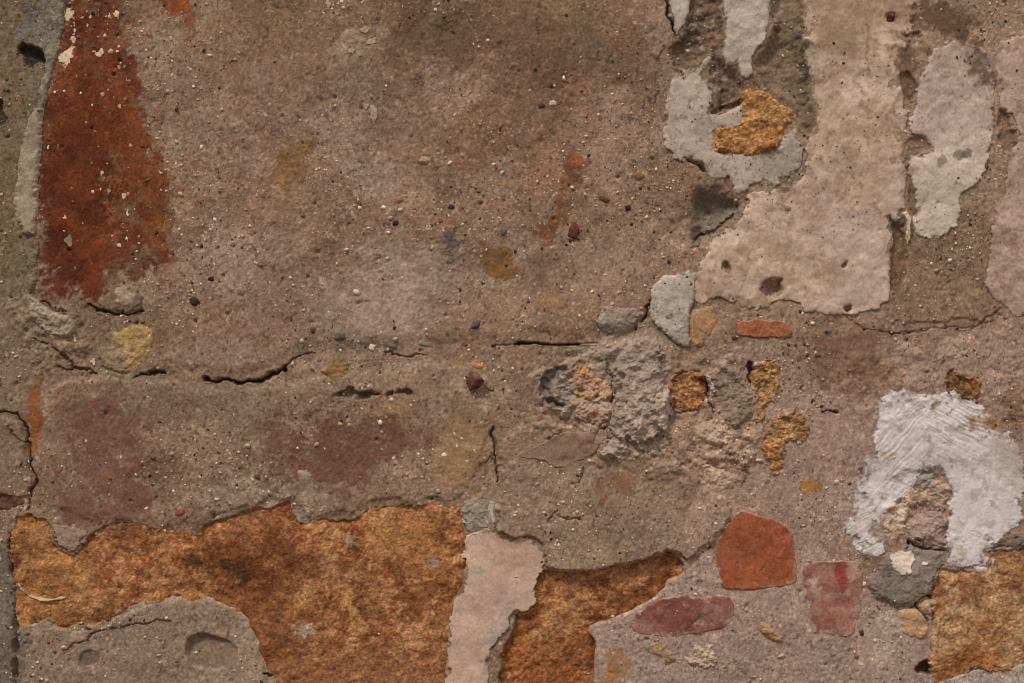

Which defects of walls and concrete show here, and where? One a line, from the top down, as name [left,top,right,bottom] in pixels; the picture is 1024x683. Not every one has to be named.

rust [35,0,179,313]
peeling [649,0,1024,347]
crack [495,339,599,347]
crack [201,352,316,387]
peeling [889,538,928,576]
spalling [77,646,104,669]
spalling [184,631,240,674]